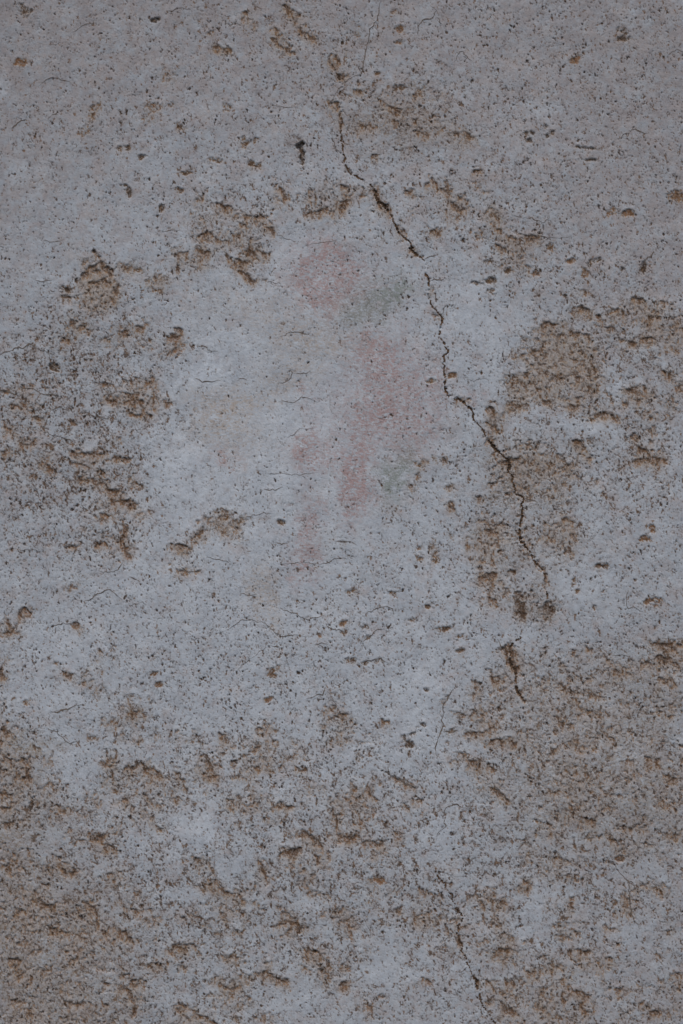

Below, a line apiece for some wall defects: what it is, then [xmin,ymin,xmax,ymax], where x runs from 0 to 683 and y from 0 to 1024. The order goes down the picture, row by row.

flaking render [0,169,355,580]
flaking render [0,606,683,1024]
crack [362,591,405,663]
crack [331,4,550,599]
flaking render [415,495,560,633]
crack [487,637,530,707]
flaking render [482,257,683,595]
peeling [643,595,664,608]